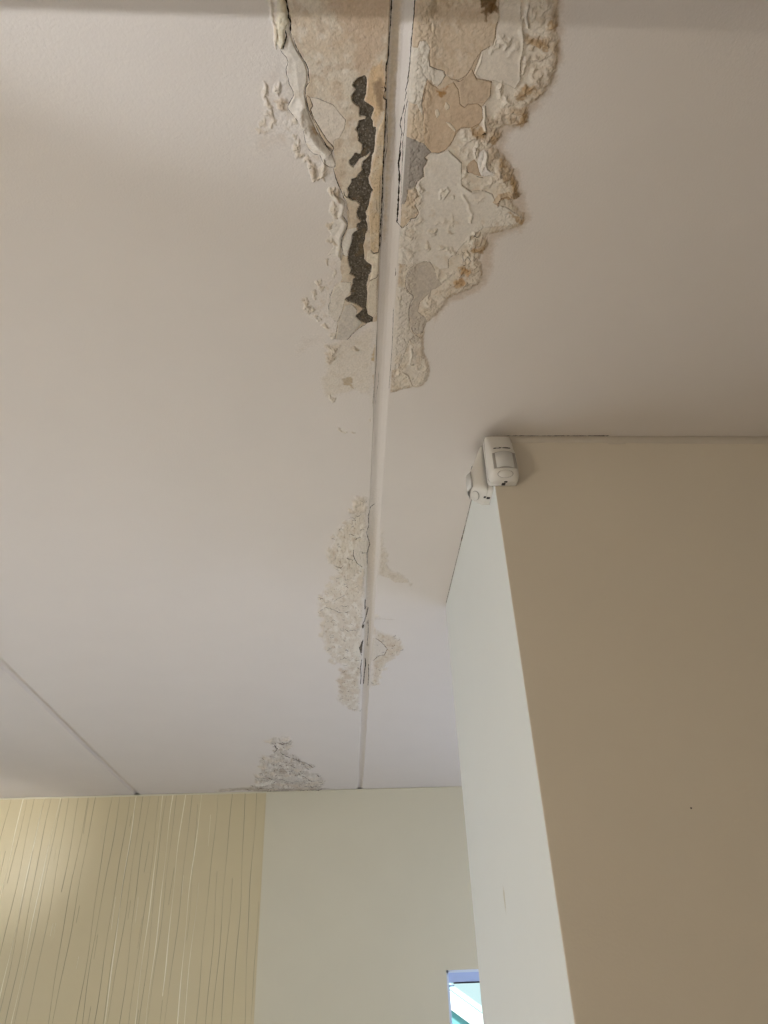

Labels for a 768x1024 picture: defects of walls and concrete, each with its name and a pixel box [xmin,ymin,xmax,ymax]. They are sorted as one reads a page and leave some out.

crack [281,0,352,250]
peeling [253,0,390,340]
crack [328,0,467,404]
peeling [389,0,562,396]
water stain [431,0,569,332]
peeling [213,736,343,792]
crack [317,501,399,704]
peeling [315,495,406,712]